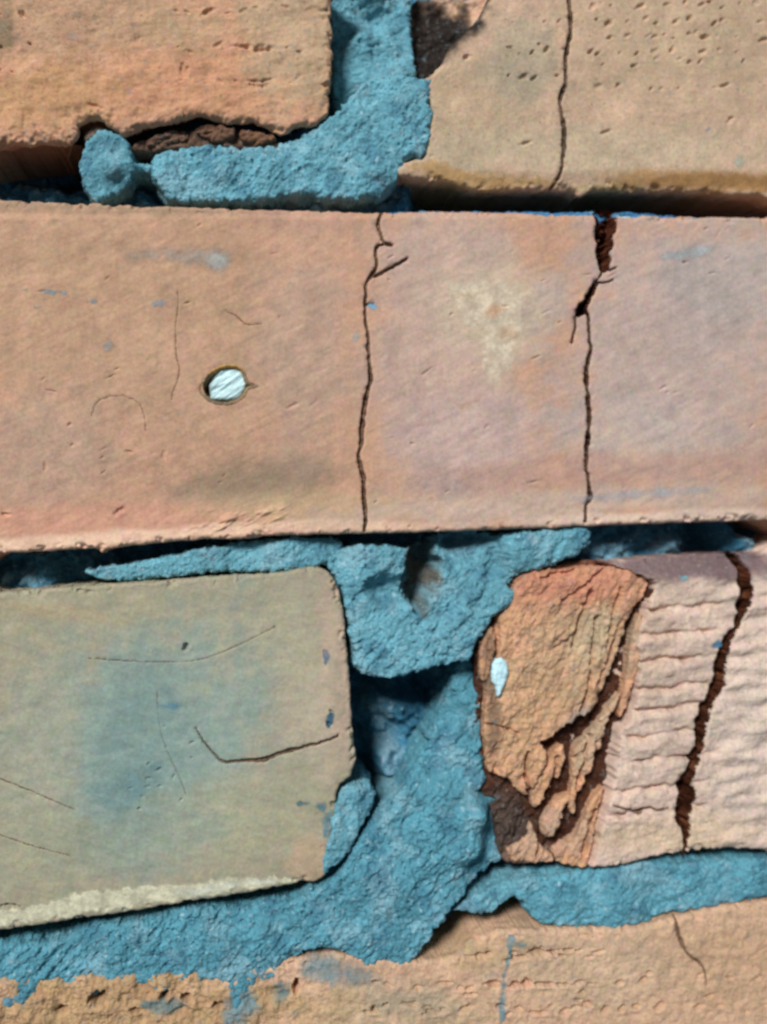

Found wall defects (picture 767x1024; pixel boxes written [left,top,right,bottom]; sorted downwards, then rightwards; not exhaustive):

spalling [131,124,278,165]
crack [549,0,573,191]
crack [357,213,408,531]
crack [570,209,617,522]
crack [196,729,337,763]
spalling [470,558,654,868]
crack [614,549,754,857]